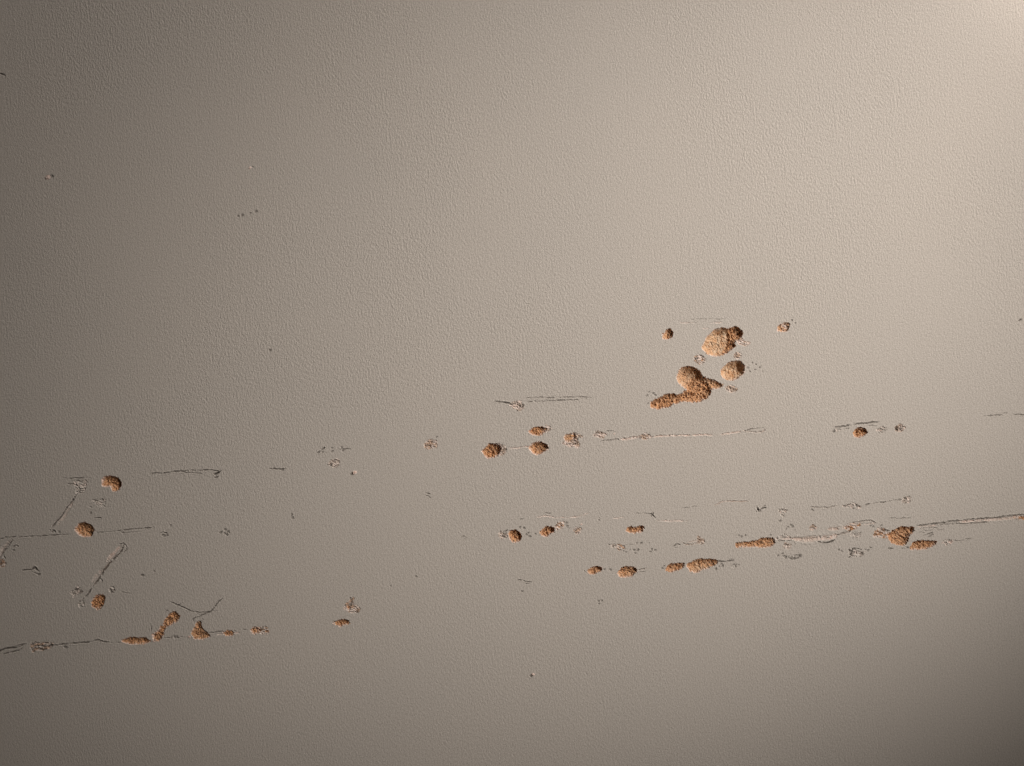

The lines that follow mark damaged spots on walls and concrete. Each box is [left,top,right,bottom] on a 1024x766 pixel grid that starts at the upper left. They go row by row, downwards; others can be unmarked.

flaking render [645,325,751,410]
flaking render [481,443,507,459]
flaking render [528,424,552,456]
flaking render [852,423,906,439]
flaking render [74,475,122,538]
flaking render [497,521,583,544]
flaking render [872,517,972,551]
flaking render [584,534,776,578]
flaking render [70,585,132,611]
flaking render [121,610,181,645]